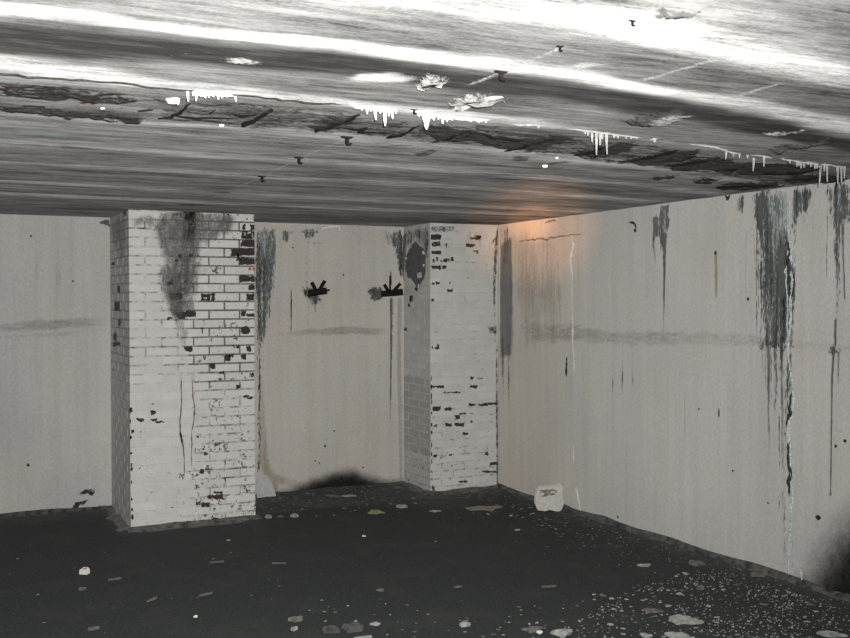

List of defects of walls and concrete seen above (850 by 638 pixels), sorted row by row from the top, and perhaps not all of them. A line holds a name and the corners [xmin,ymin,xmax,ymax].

leakage [350,104,397,126]
spalling [0,85,847,201]
spalling [415,76,448,91]
leakage [409,110,487,130]
leakage [571,129,640,155]
leakage [692,144,850,305]
peeling [225,345,251,361]
leakage [255,229,292,342]
leakage [754,187,811,465]
crack [179,380,196,476]
peeling [431,376,499,491]
peeling [200,490,224,509]